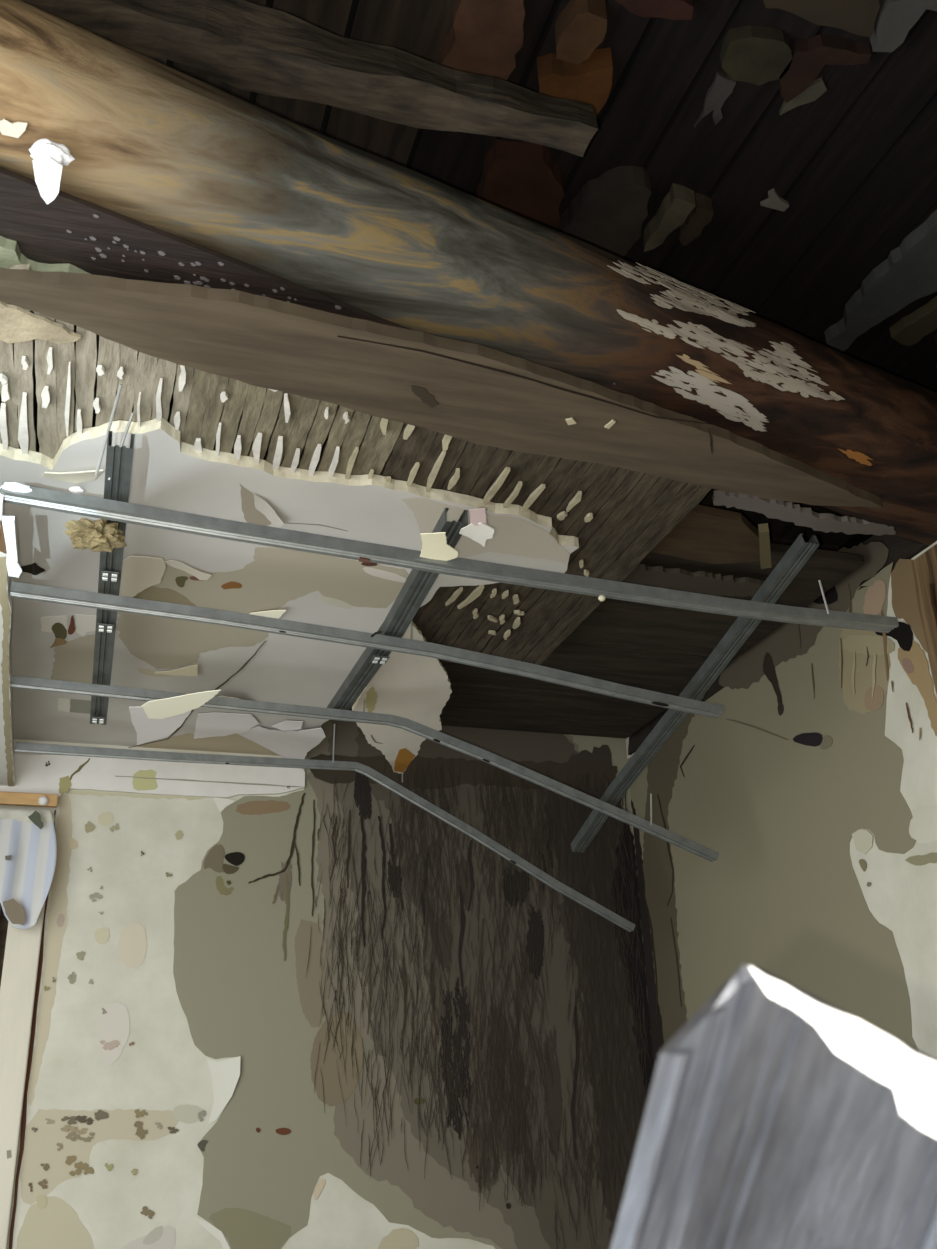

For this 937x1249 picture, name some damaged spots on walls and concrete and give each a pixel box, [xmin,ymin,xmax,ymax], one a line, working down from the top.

spalling [29,138,74,204]
peeling [607,261,845,431]
spalling [2,516,22,578]
damp [363,567,406,583]
peeling [401,497,570,563]
damp [805,542,937,736]
damp [16,769,207,1249]
damp [204,844,239,896]
peeling [129,690,502,1249]
damp [272,622,824,1249]
peeling [667,627,919,1051]
damp [209,1208,291,1249]